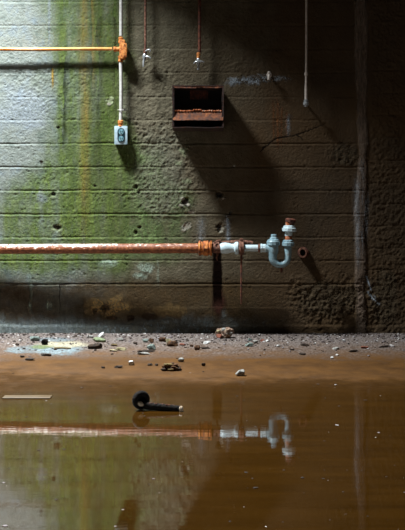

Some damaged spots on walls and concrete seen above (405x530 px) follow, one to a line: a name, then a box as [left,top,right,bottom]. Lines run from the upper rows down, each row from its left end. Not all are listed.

leakage [0,282,253,333]
leakage [354,0,376,333]